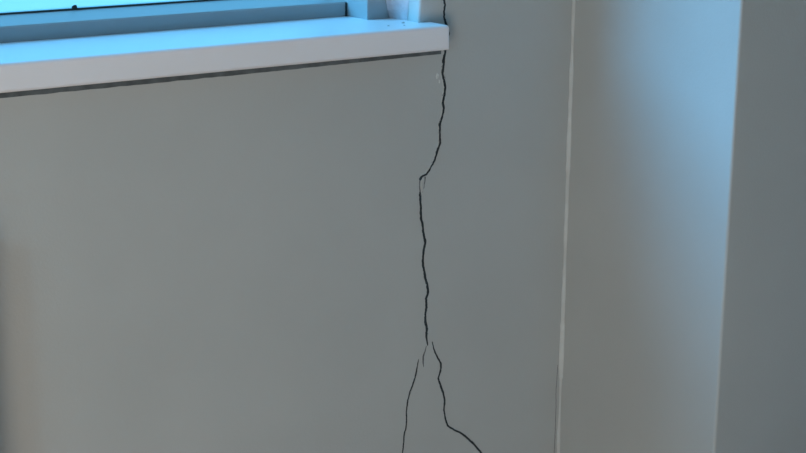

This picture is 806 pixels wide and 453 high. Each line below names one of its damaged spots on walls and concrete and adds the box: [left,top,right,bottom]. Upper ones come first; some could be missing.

crack [0,0,482,453]